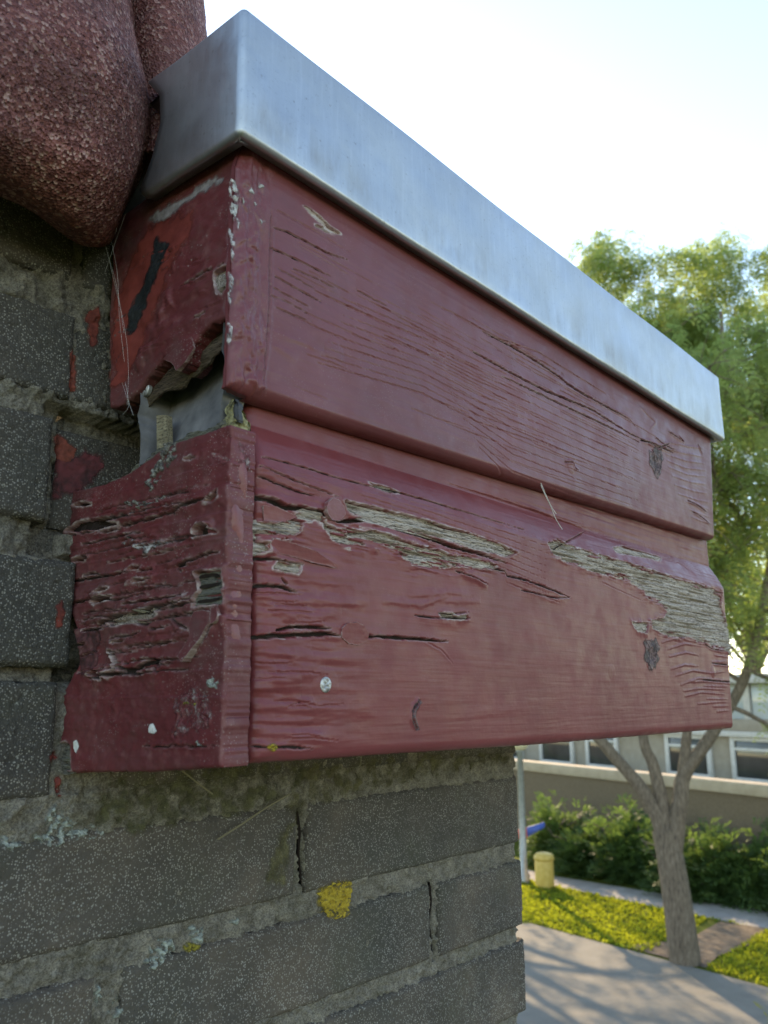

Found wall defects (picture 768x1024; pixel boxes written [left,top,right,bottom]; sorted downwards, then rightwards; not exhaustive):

peeling [215,271,234,303]
peeling [164,336,196,372]
crack [474,337,597,417]
crack [254,458,523,530]
peeling [123,536,161,554]
peeling [177,571,222,662]
crack [250,626,336,639]
peeling [252,497,514,573]
crack [368,613,466,642]
crack [402,532,561,598]
peeling [548,534,732,653]
crack [295,811,303,886]